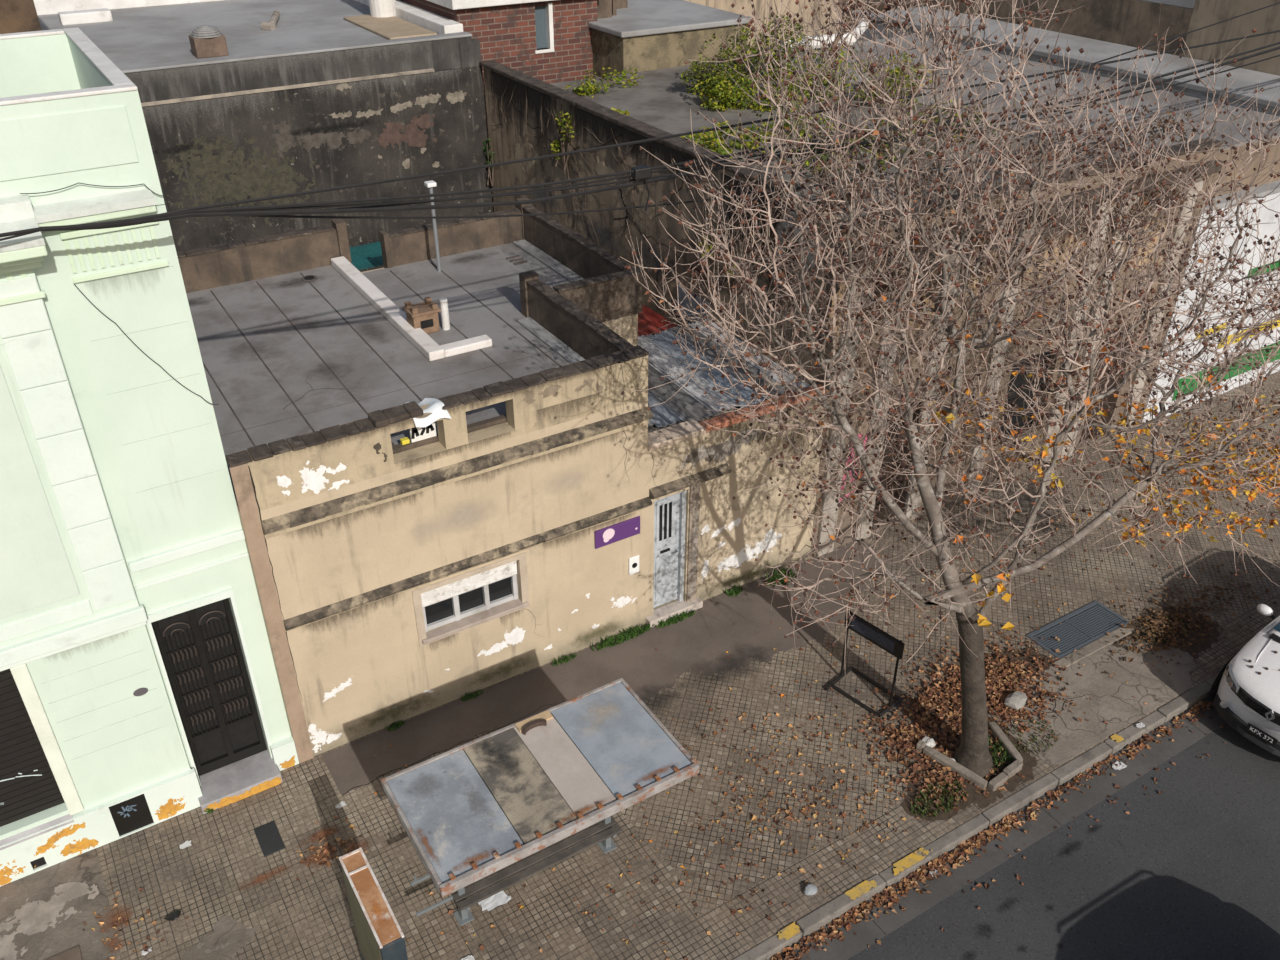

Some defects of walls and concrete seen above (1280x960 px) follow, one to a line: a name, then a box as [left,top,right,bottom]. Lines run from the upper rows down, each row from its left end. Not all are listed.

damp [402,147,440,169]
peeling [276,461,350,496]
peeling [688,498,782,599]
peeling [477,626,526,657]
peeling [323,678,352,702]
peeling [308,723,342,753]
peeling [204,756,295,811]
peeling [155,796,185,820]
peeling [0,822,99,886]